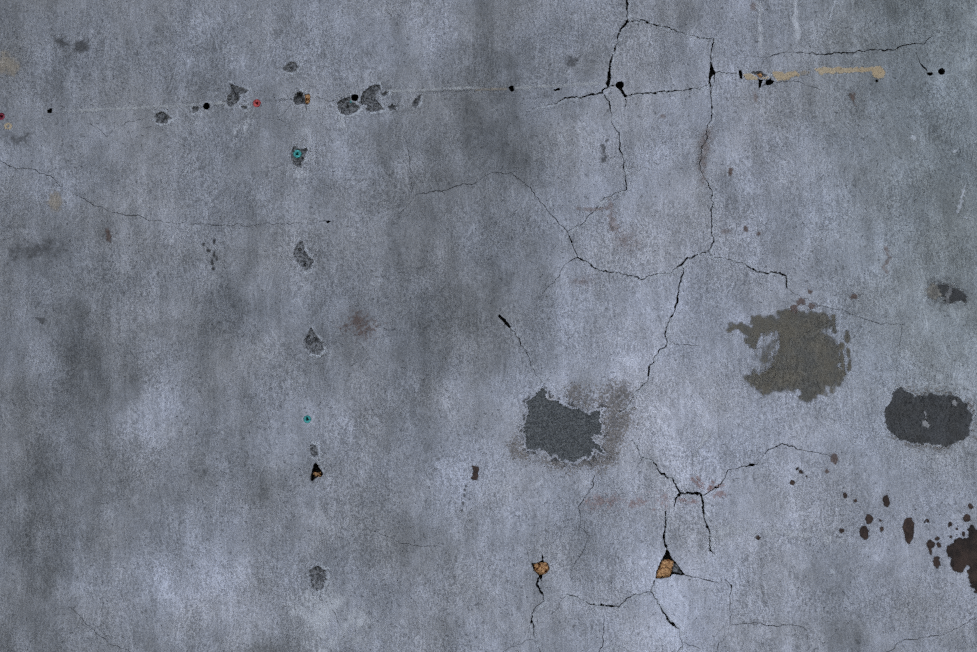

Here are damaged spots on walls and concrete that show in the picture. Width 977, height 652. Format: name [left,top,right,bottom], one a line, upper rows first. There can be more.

spalling [227,80,250,112]
spalling [335,82,423,117]
crack [399,0,934,413]
spalling [293,241,314,274]
spalling [304,327,327,357]
water stain [727,309,851,402]
peeling [505,378,643,478]
crack [571,476,595,571]
crack [634,442,839,556]
spalling [307,563,330,594]
crack [503,554,809,652]